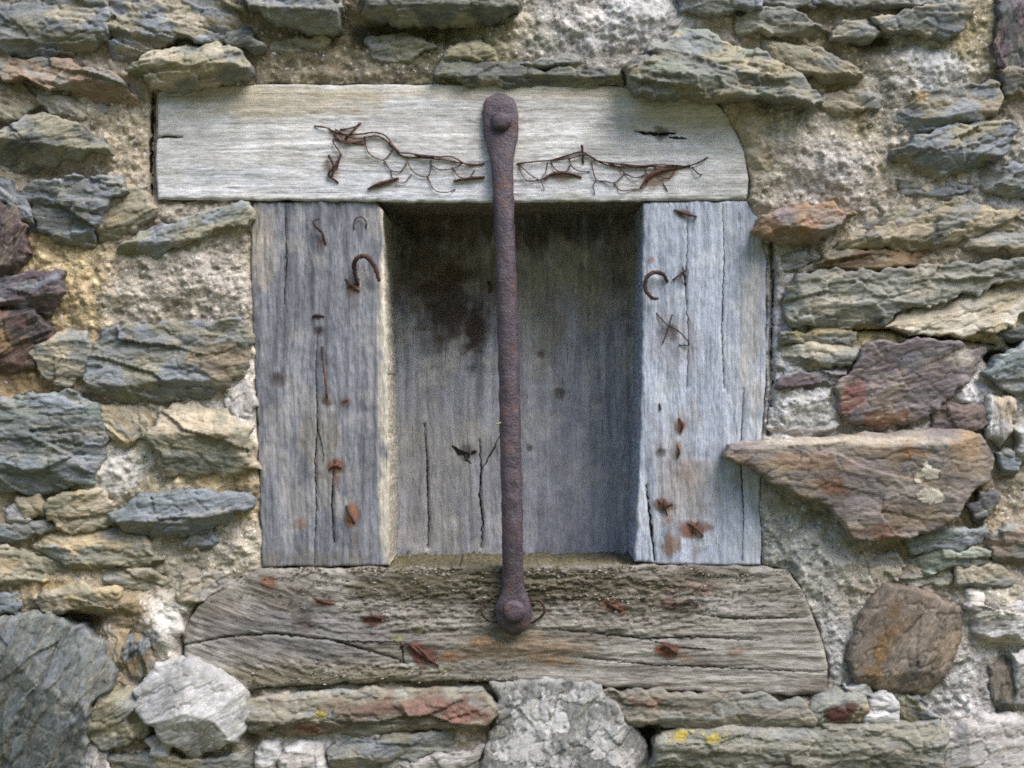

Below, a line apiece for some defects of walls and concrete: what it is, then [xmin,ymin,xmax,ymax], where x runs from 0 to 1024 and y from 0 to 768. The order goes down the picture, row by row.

crack [149,94,181,194]
crack [635,131,687,139]
crack [314,332,335,564]
rust [328,459,343,472]
rust [345,503,359,527]
rust [654,498,673,512]
rust [665,521,713,555]
rust [363,614,384,626]
crack [185,633,406,664]
rust [409,636,568,664]
rust [655,643,691,660]
crack [559,614,823,673]